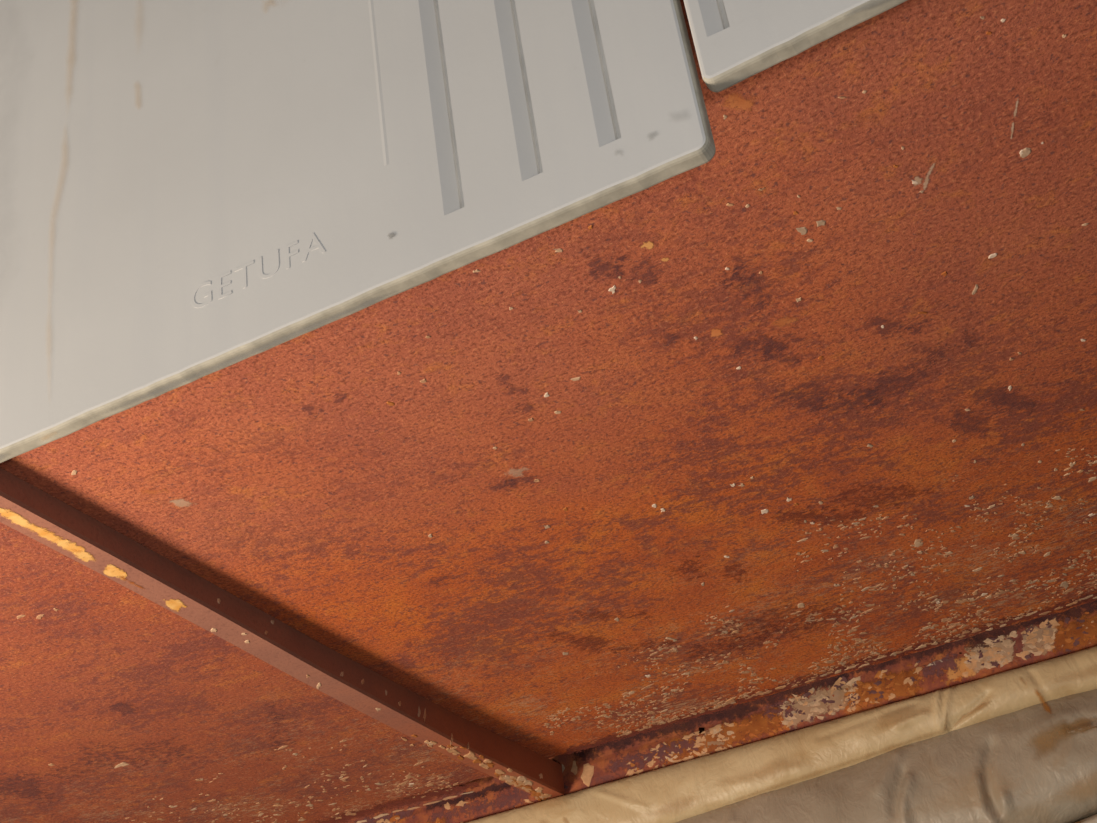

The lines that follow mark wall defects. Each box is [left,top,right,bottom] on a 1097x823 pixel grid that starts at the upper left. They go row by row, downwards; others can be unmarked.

peeling [796,220,826,242]
peeling [1054,448,1097,482]
corrosion [0,508,95,562]
corrosion [104,564,142,588]
corrosion [165,599,187,612]
peeling [543,484,1097,737]
corrosion [566,593,1097,777]
peeling [626,722,734,776]
corrosion [316,780,530,823]